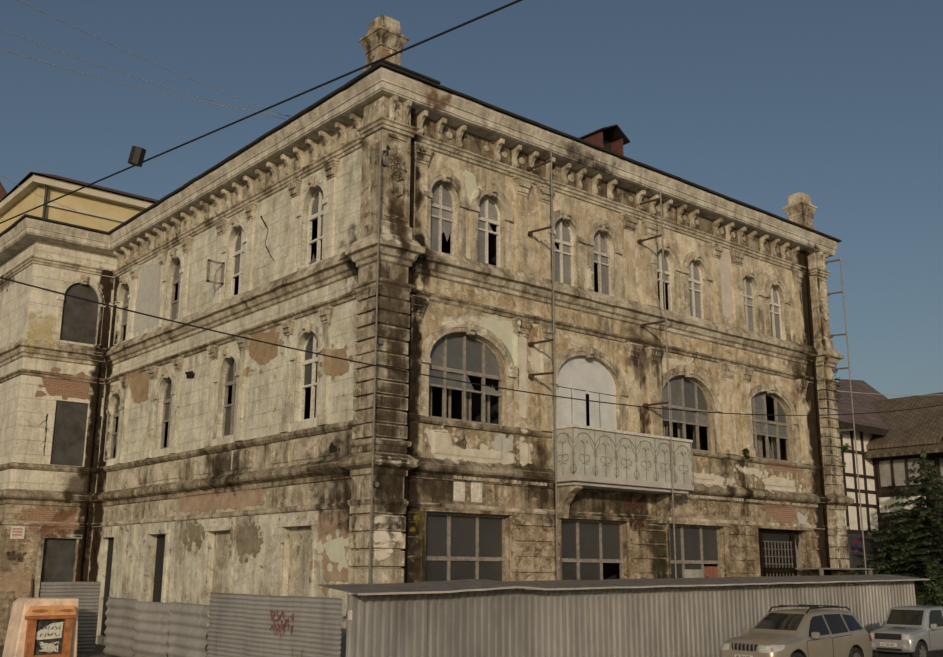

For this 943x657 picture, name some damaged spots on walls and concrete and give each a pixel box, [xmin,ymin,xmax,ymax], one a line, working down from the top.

flaking render [35,367,94,402]
flaking render [237,321,284,376]
spalling [317,344,354,381]
damp [376,134,458,583]
peeling [424,304,549,466]
crack [40,414,48,454]
damp [65,269,120,582]
flaking render [172,484,264,552]
peeling [229,521,263,564]
peeling [371,511,426,561]
damp [570,490,670,579]
flaking render [692,461,812,530]